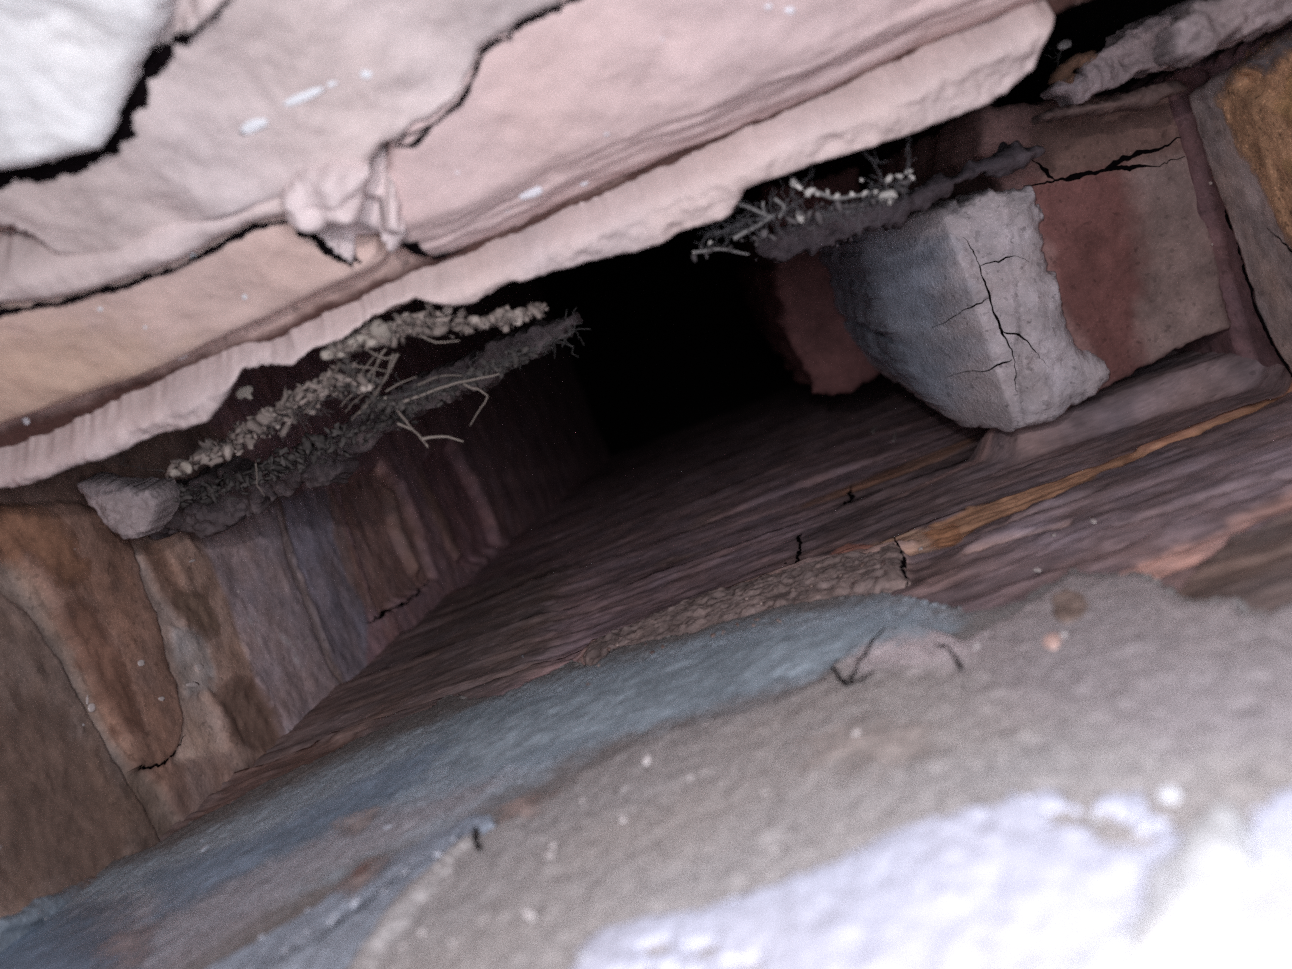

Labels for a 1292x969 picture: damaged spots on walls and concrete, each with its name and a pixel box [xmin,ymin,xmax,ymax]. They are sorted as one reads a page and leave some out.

peeling [0,0,228,169]
crack [369,0,580,173]
spalling [1048,38,1073,73]
crack [1025,137,1185,186]
crack [932,237,1045,391]